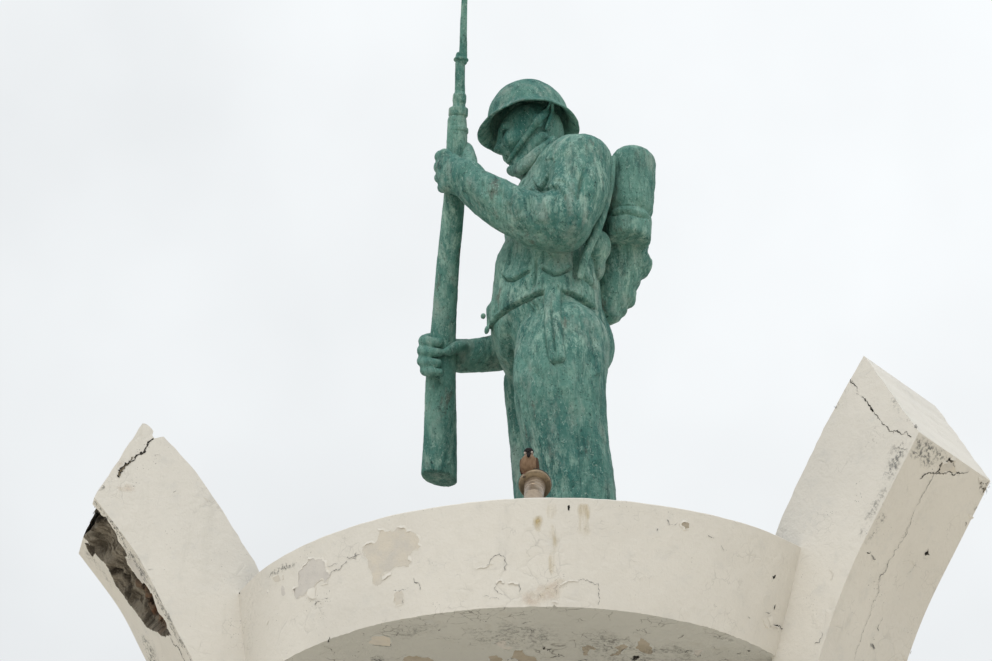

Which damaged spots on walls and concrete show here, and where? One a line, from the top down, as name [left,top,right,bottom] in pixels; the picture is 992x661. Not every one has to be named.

crack [850,379,911,437]
crack [117,438,154,478]
spalling [84,507,171,637]
peeling [281,556,331,605]
peeling [361,525,422,588]
peeling [488,647,551,661]
peeling [609,638,655,661]